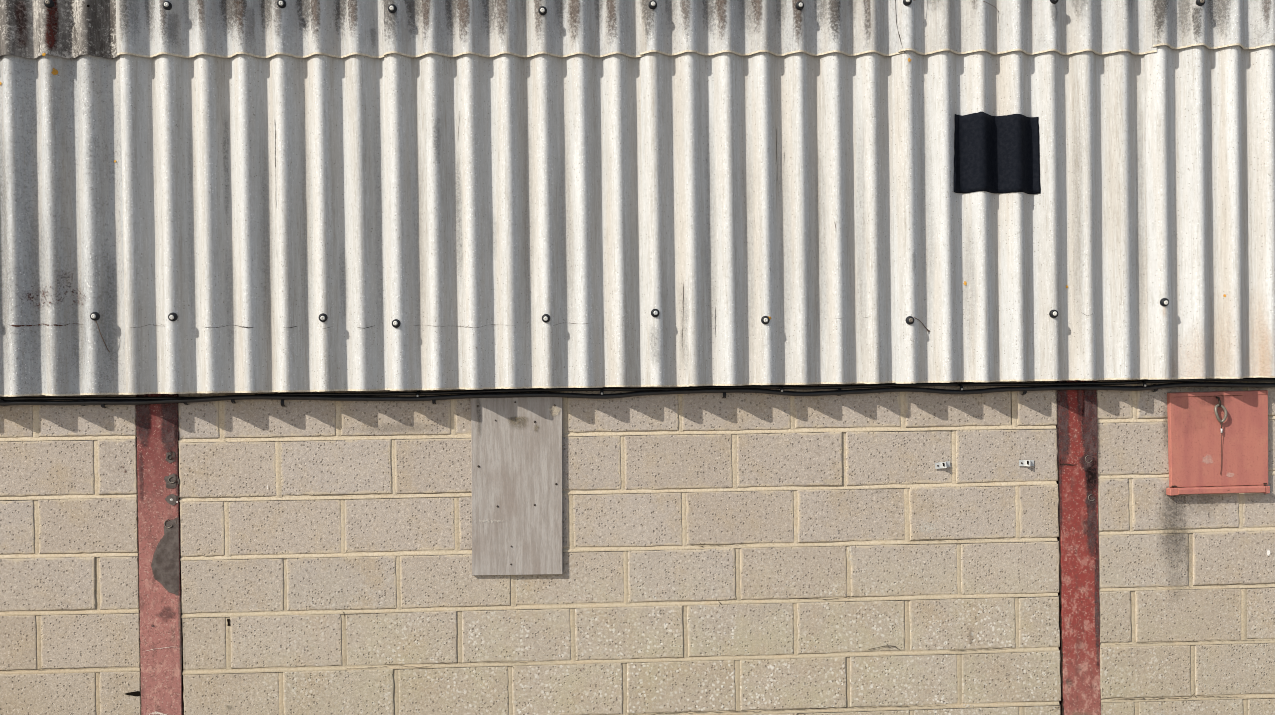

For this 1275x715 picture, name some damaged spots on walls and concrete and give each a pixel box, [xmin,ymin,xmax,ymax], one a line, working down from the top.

corrosion [45,0,58,48]
leakage [297,0,320,32]
leakage [336,0,357,28]
leakage [409,0,430,27]
leakage [447,0,469,35]
leakage [570,0,580,38]
leakage [607,0,616,34]
leakage [716,0,726,29]
leakage [793,0,802,36]
leakage [829,0,840,36]
leakage [1153,0,1168,34]
peeling [135,394,179,596]